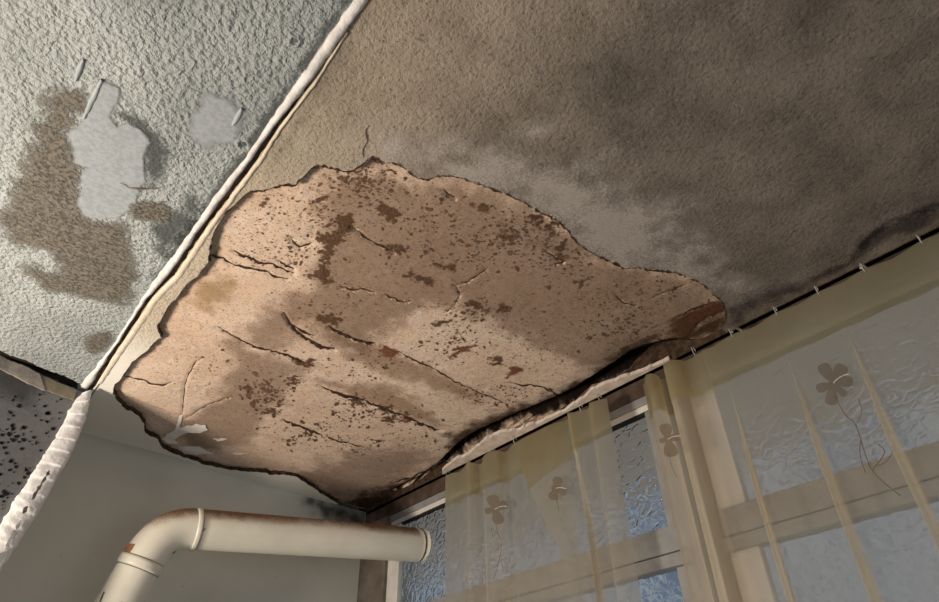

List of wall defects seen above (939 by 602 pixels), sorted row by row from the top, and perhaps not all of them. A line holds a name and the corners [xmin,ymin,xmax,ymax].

water stain [0,87,198,306]
peeling [67,82,149,219]
peeling [190,93,247,148]
water stain [449,156,706,277]
water stain [814,204,939,280]
water stain [83,331,113,355]
spalling [113,156,727,509]
water stain [0,391,63,509]